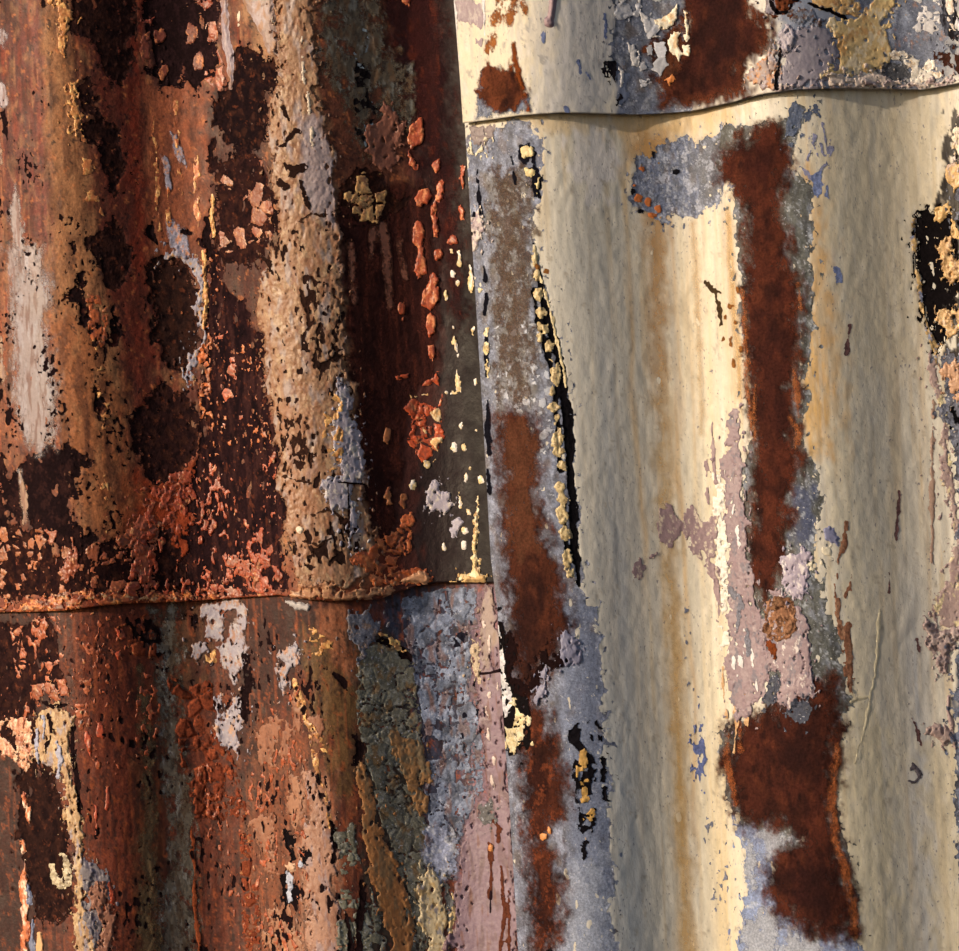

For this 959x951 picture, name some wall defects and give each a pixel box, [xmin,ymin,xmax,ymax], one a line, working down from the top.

rust [474,0,532,119]
peeling [601,0,700,114]
rust [657,0,776,109]
peeling [409,117,624,951]
rust [483,161,577,951]
rust [712,118,808,605]
peeling [621,0,959,764]
peeling [901,113,959,884]
peeling [182,598,348,951]
rust [716,666,862,944]
peeling [722,774,871,951]